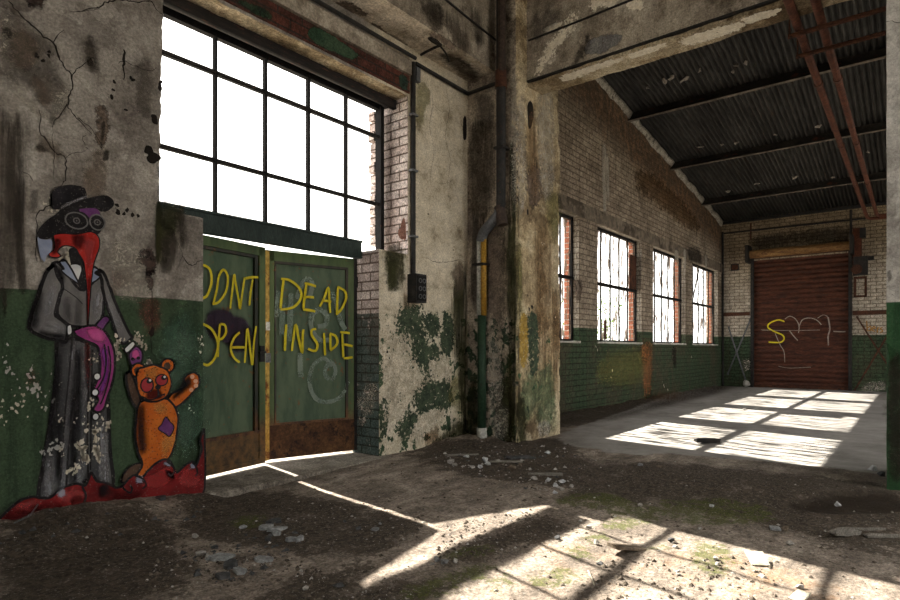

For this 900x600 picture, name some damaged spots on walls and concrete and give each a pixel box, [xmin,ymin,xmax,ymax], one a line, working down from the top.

crack [76,0,164,17]
crack [118,49,153,80]
peeling [534,0,644,76]
peeling [559,43,667,81]
peeling [678,8,781,46]
crack [8,1,103,260]
water stain [0,116,37,315]
water stain [451,95,504,430]
flaking render [378,301,455,442]